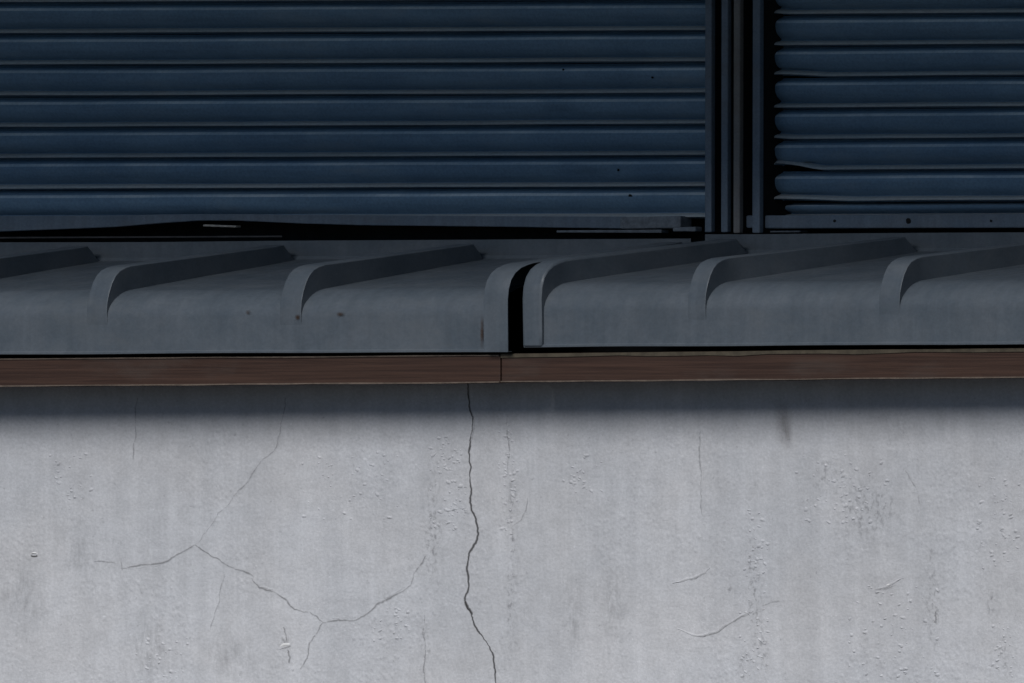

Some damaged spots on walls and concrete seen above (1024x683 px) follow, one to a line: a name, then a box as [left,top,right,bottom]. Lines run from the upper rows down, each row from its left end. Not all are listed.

crack [463,384,496,683]